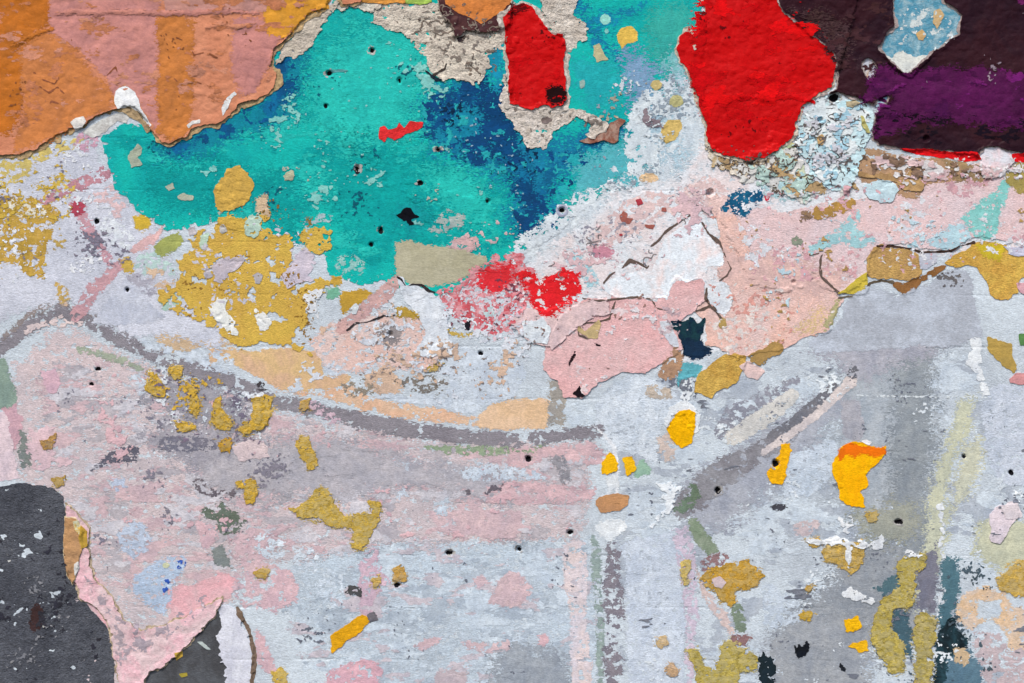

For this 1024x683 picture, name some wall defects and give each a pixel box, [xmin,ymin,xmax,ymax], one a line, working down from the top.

peeling [0,0,625,160]
peeling [480,0,1024,399]
peeling [188,224,227,249]
peeling [202,254,245,283]
peeling [244,213,262,238]
peeling [280,225,349,319]
crack [578,204,732,339]
crack [802,248,894,299]
crack [876,241,976,254]
peeling [208,297,239,336]
peeling [254,308,272,331]
peeling [0,403,227,683]